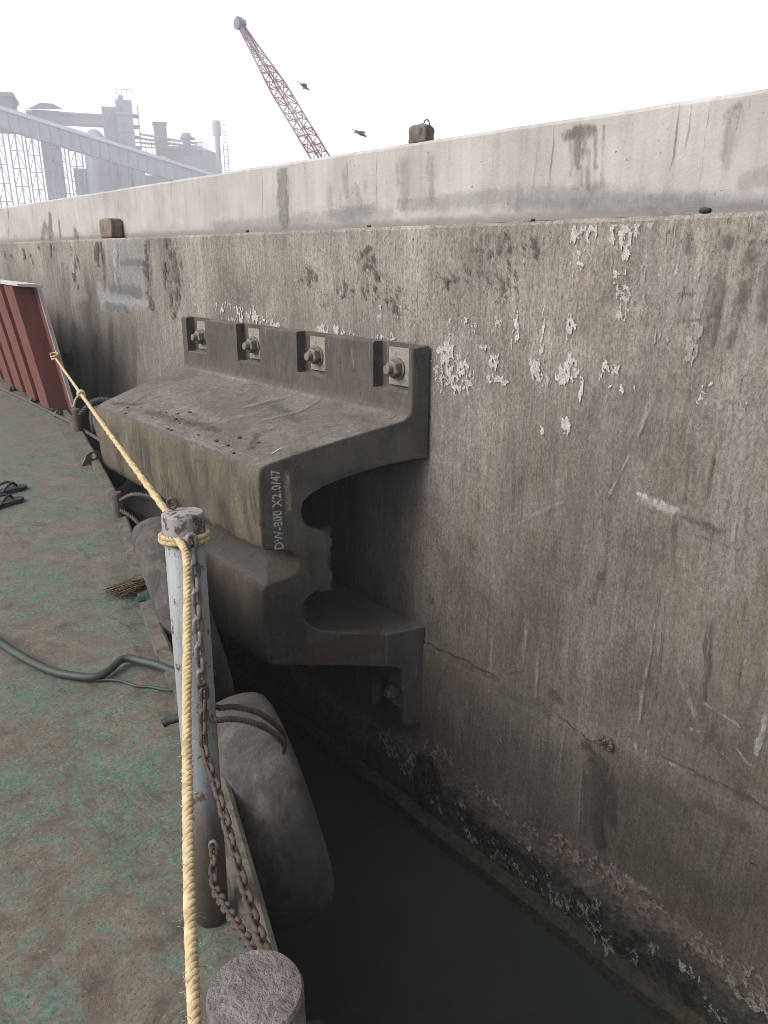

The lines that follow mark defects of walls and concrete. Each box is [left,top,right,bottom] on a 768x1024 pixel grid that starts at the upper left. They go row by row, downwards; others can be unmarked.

water stain [564,125,595,170]
peeling [570,223,654,321]
peeling [430,317,509,396]
peeling [529,305,584,402]
peeling [683,294,705,366]
peeling [561,416,571,435]
crack [700,627,711,697]